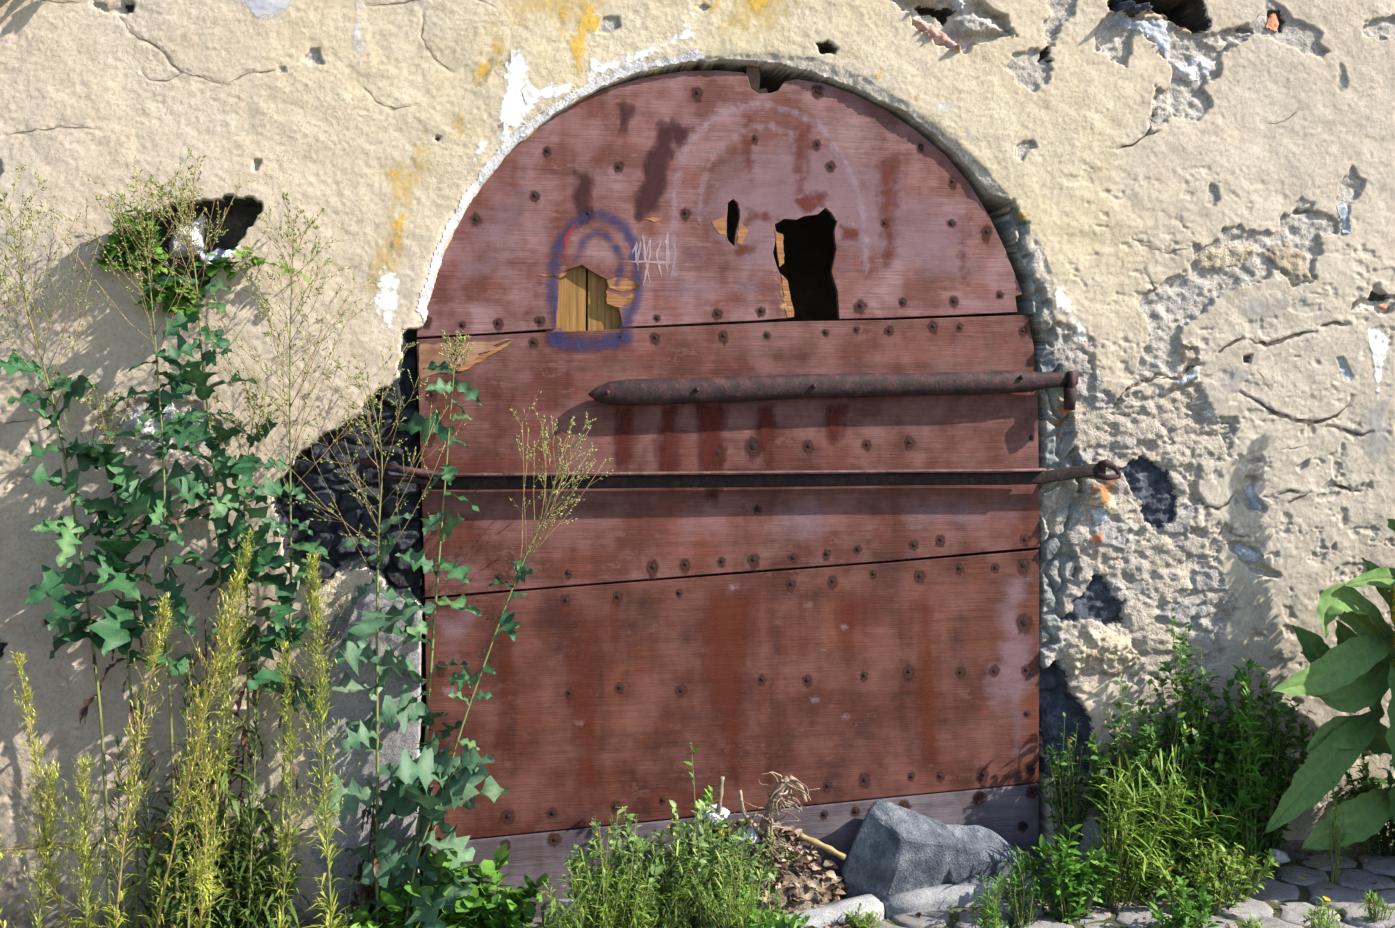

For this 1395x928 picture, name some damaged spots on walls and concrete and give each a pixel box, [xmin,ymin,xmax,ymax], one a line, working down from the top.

crack [121,18,273,86]
crack [370,0,450,71]
damp [473,12,694,161]
spalling [893,0,1012,54]
spalling [1094,0,1328,126]
rust [575,174,592,222]
rust [635,123,687,221]
spalling [1351,284,1395,315]
rust [696,403,724,499]
spalling [272,49,1364,778]
crack [1111,321,1371,450]
crack [1277,484,1360,502]